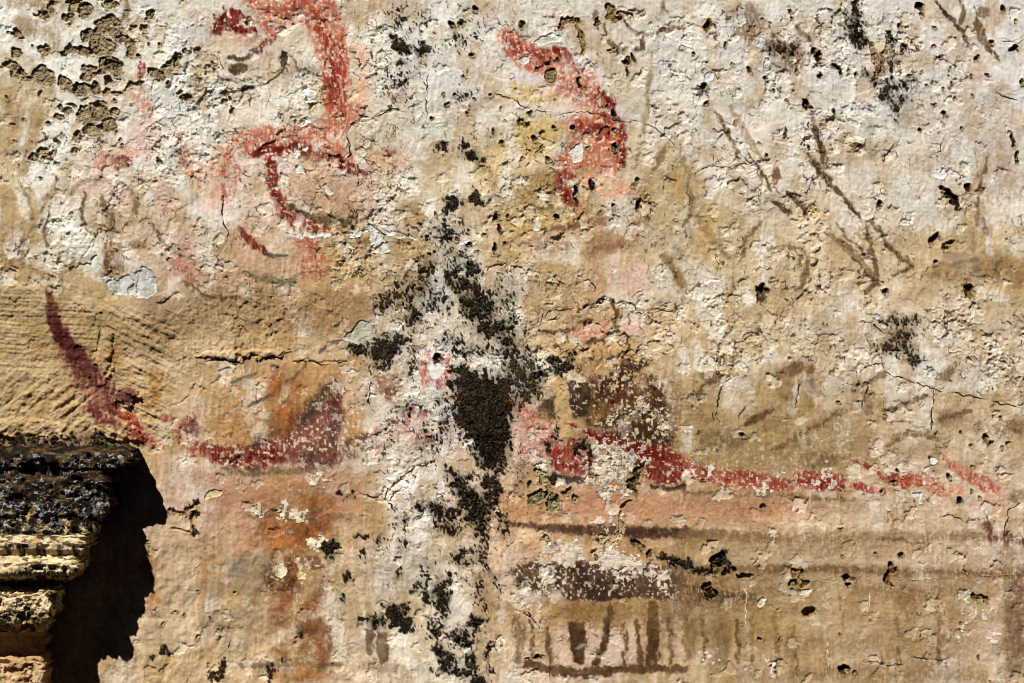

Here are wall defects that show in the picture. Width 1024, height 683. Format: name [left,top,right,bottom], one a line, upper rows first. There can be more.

damp [844,0,869,50]
spalling [2,0,201,164]
damp [862,29,917,122]
peeling [101,265,158,299]
crack [0,51,562,629]
damp [873,309,925,369]
damp [346,185,577,683]
crack [516,446,612,514]
peeling [509,351,672,611]
peeling [691,448,718,482]
peeling [749,471,792,511]
crack [517,630,595,680]